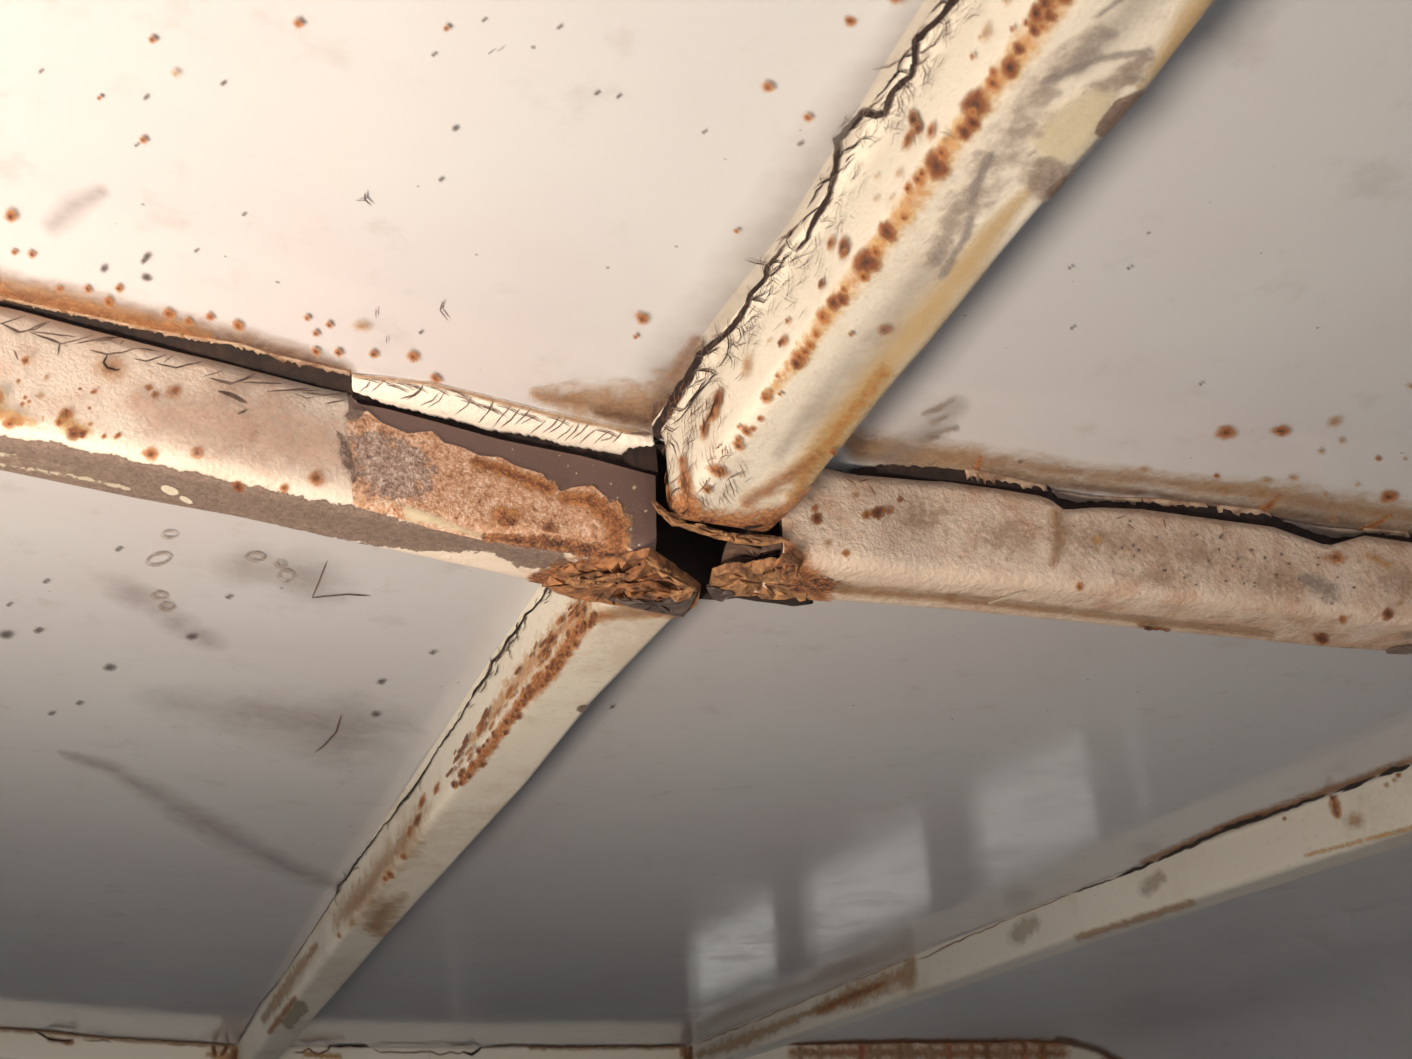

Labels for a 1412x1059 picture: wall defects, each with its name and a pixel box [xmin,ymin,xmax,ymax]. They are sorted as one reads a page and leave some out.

corrosion [4,210,17,222]
crack [0,0,982,513]
corrosion [732,0,1071,451]
corrosion [0,280,349,376]
corrosion [0,356,121,441]
corrosion [142,447,158,460]
corrosion [309,470,325,486]
corrosion [700,389,722,439]
corrosion [333,411,697,938]
crack [0,587,552,1048]
corrosion [680,957,914,1059]
corrosion [788,1037,1120,1059]